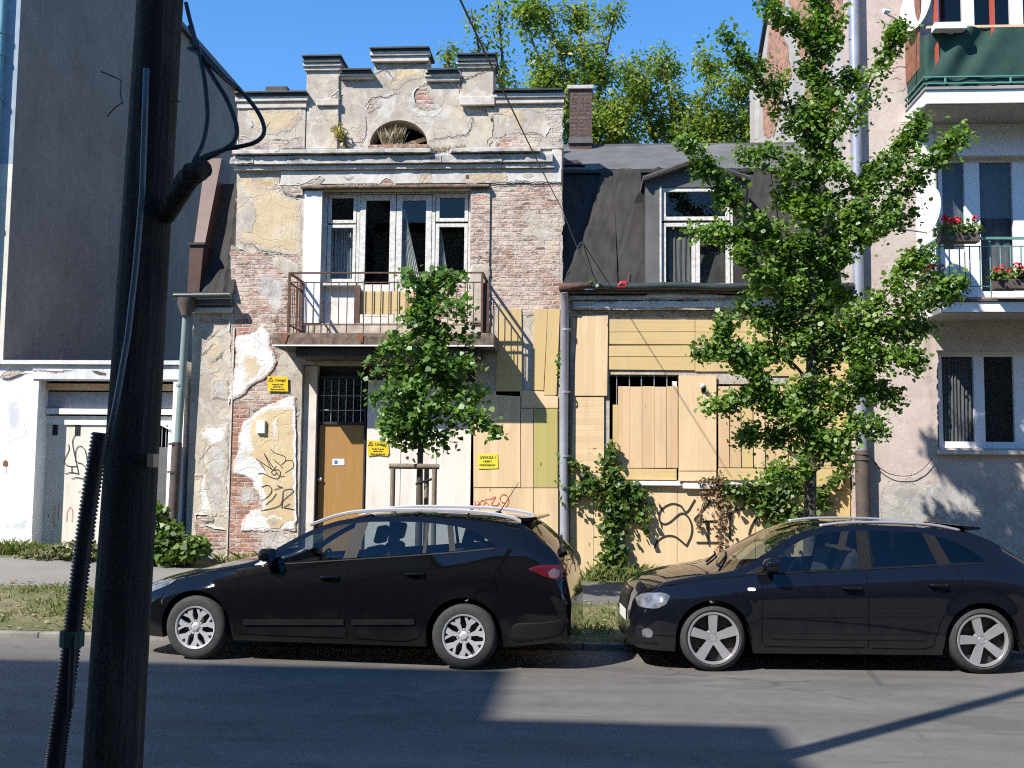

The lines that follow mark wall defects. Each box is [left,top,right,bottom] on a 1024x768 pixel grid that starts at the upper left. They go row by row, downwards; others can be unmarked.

flaking render [388,63,443,117]
crack [352,63,489,144]
crack [430,118,544,147]
flaking render [462,171,565,322]
peeling [193,173,325,561]